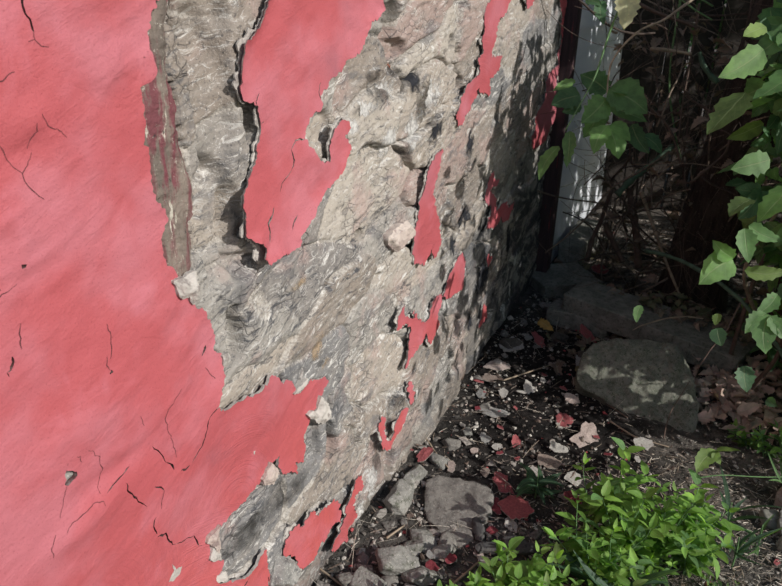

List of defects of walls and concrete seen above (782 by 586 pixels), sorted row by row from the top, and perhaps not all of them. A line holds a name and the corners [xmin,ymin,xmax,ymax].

peeling [453,0,511,128]
peeling [529,0,567,151]
crack [0,114,64,198]
peeling [231,0,386,266]
peeling [410,148,444,266]
peeling [393,251,466,370]
peeling [377,380,416,451]
peeling [478,407,510,418]
peeling [481,361,511,397]
crack [51,451,106,558]
peeling [283,475,364,571]
peeling [491,471,534,533]